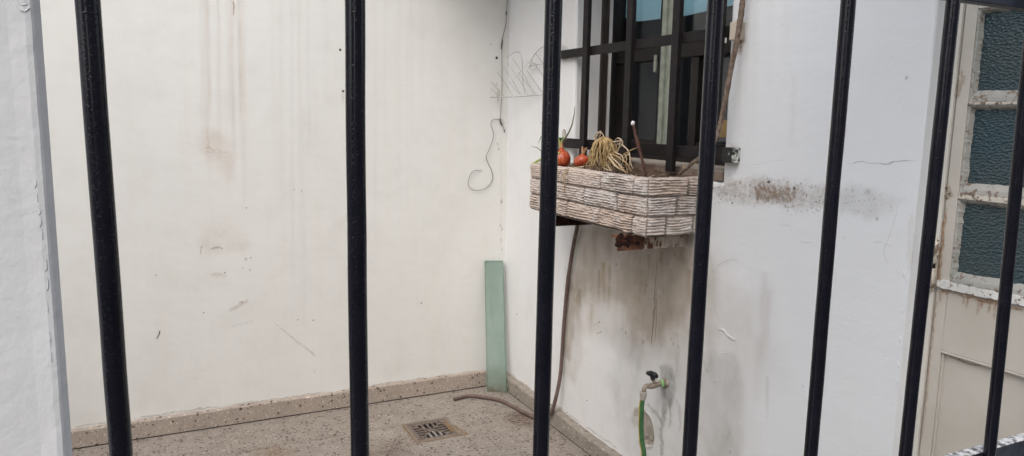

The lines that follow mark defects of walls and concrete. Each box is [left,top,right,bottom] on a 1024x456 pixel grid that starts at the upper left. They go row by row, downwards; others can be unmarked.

leakage [755,180,807,207]
corrosion [615,233,640,248]